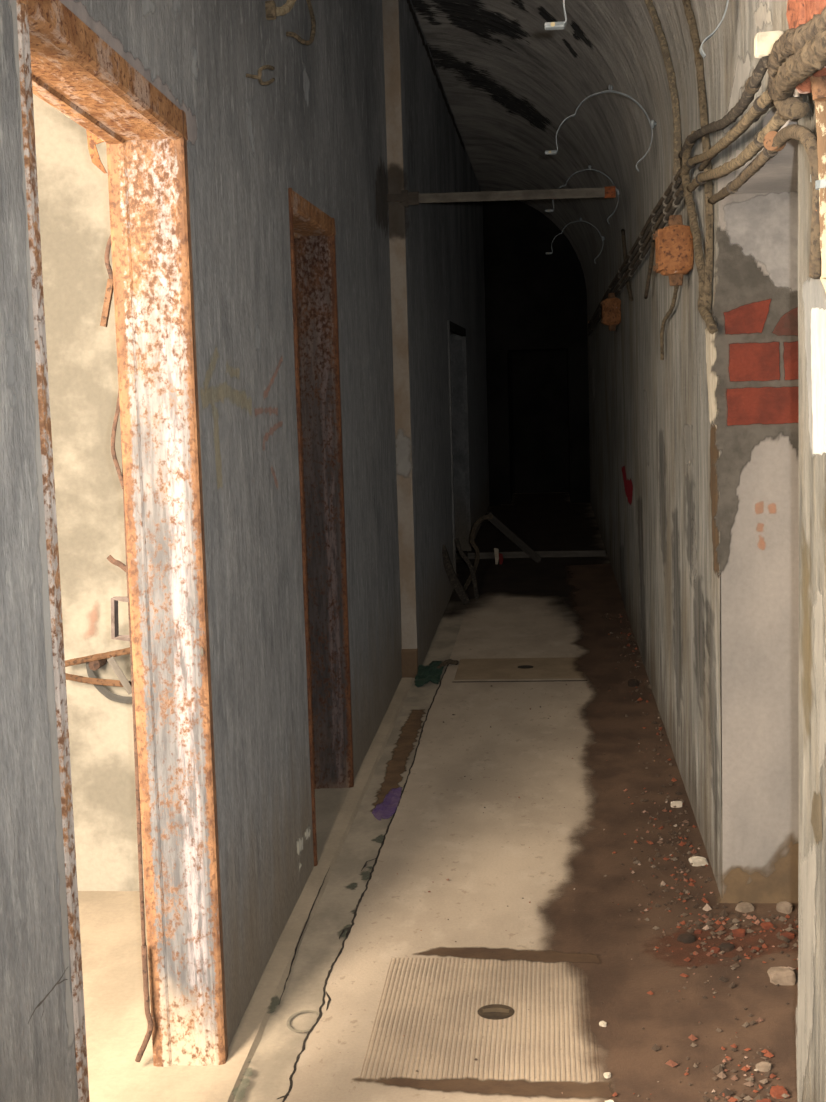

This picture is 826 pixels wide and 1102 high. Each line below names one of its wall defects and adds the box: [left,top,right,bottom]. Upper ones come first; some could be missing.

damp [427,43,553,132]
damp [411,0,593,59]
spalling [705,227,826,576]
crack [277,664,449,1102]